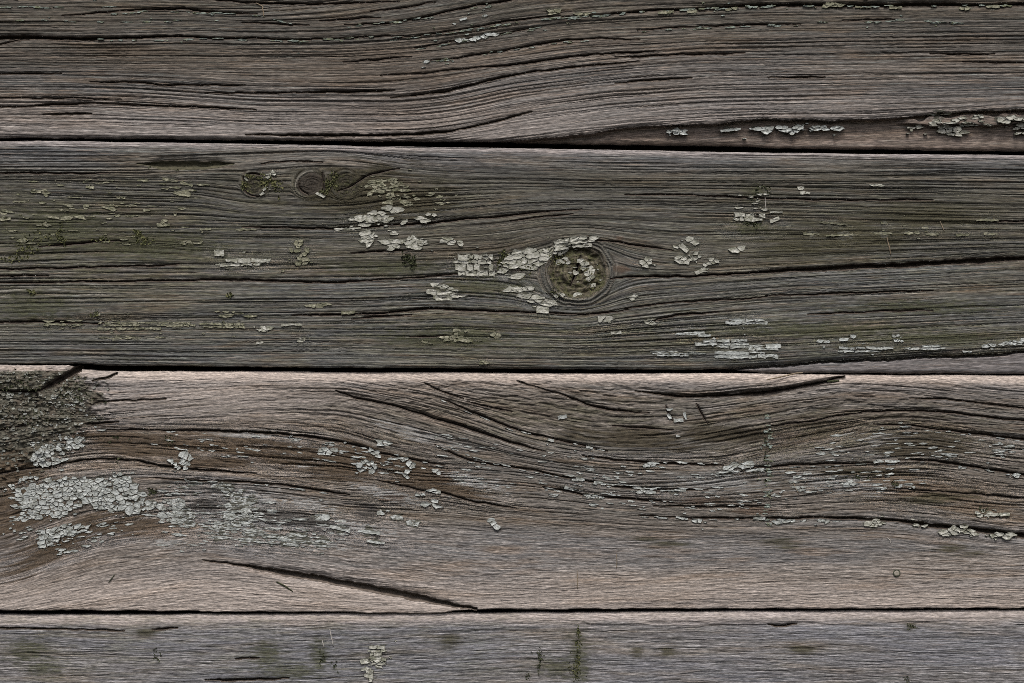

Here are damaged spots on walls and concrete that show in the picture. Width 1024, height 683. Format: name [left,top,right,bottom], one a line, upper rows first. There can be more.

spalling [501,109,1024,151]
peeling [733,185,783,223]
peeling [334,176,602,318]
peeling [639,256,657,268]
peeling [672,236,720,275]
spalling [650,315,1024,374]
crack [0,364,1024,539]
peeling [2,387,1024,555]
crack [203,559,477,610]
peeling [360,640,397,683]